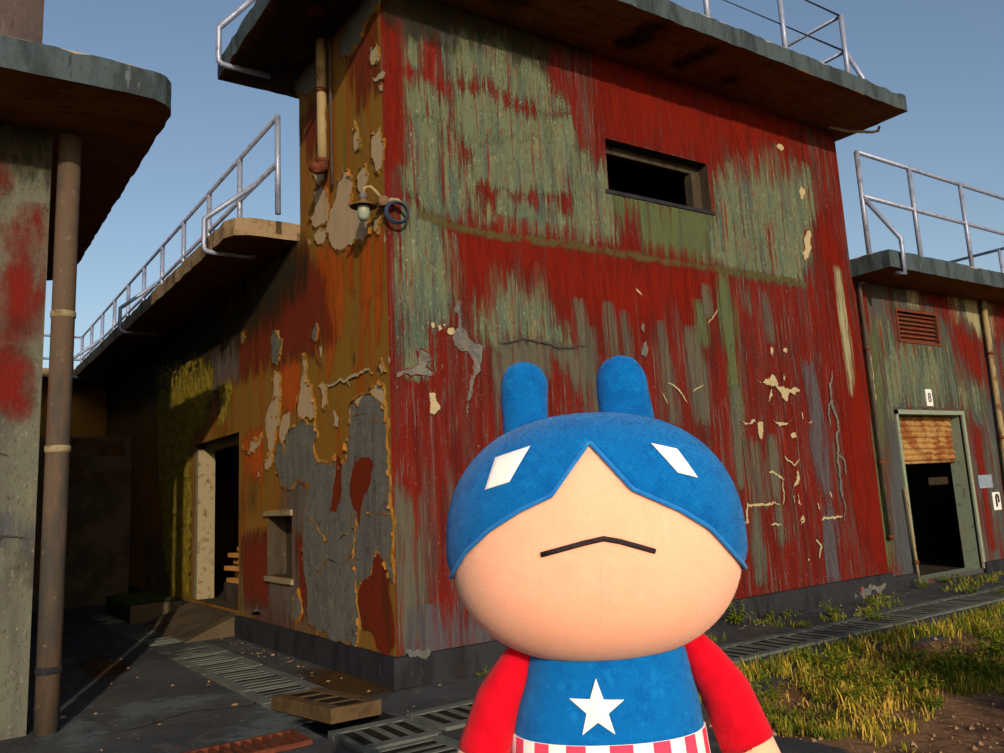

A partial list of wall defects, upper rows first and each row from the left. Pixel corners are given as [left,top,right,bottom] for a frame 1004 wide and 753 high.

water stain [227,0,360,97]
peeling [337,0,385,91]
water stain [380,0,802,180]
corrosion [235,226,385,415]
peeling [241,20,817,647]